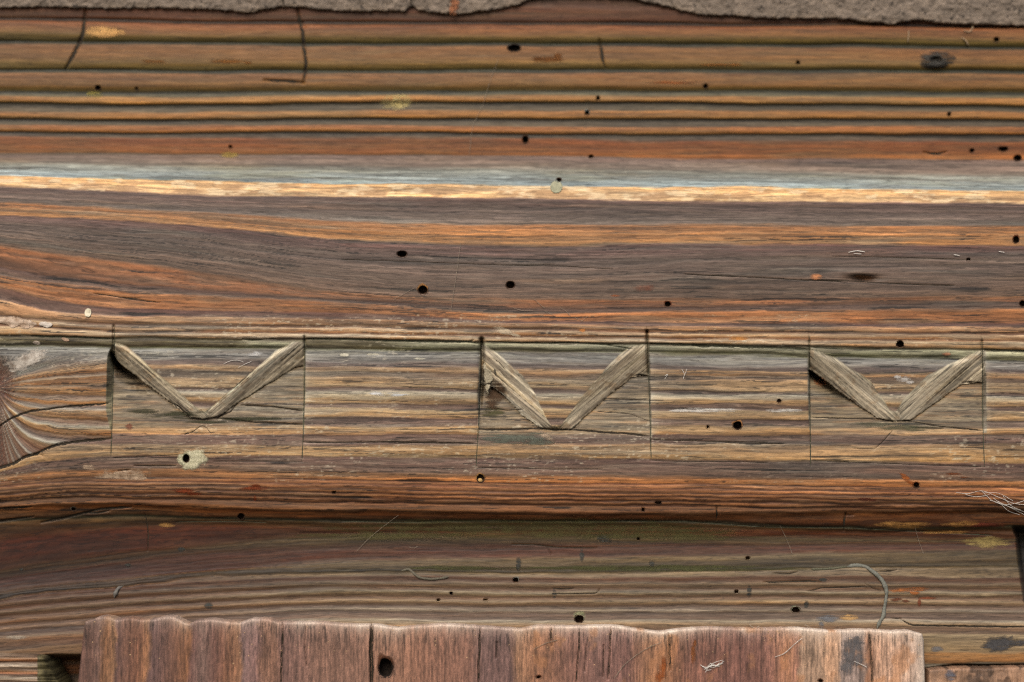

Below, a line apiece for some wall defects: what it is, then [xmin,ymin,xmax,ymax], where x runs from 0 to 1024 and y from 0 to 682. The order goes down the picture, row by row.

crack [66,14,86,69]
crack [265,0,308,83]
crack [0,374,778,472]